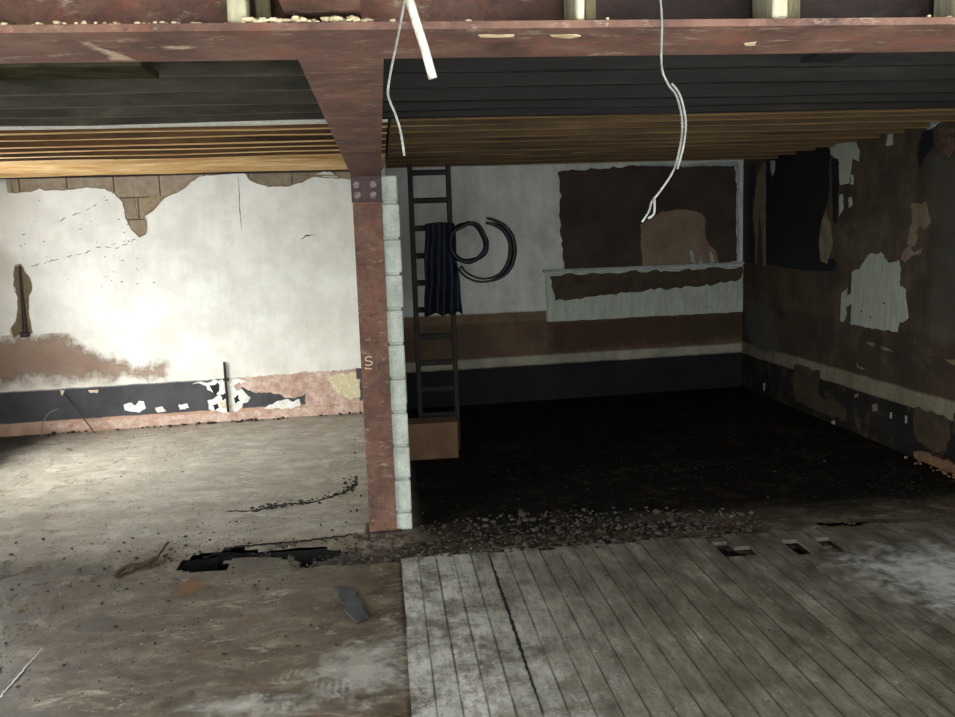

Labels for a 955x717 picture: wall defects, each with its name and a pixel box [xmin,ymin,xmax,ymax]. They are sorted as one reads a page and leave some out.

spalling [6,174,223,242]
peeling [830,142,860,215]
spalling [916,129,935,167]
spalling [10,264,33,338]
peeling [840,201,931,332]
peeling [43,368,362,435]
peeling [791,364,847,425]
peeling [904,407,955,478]